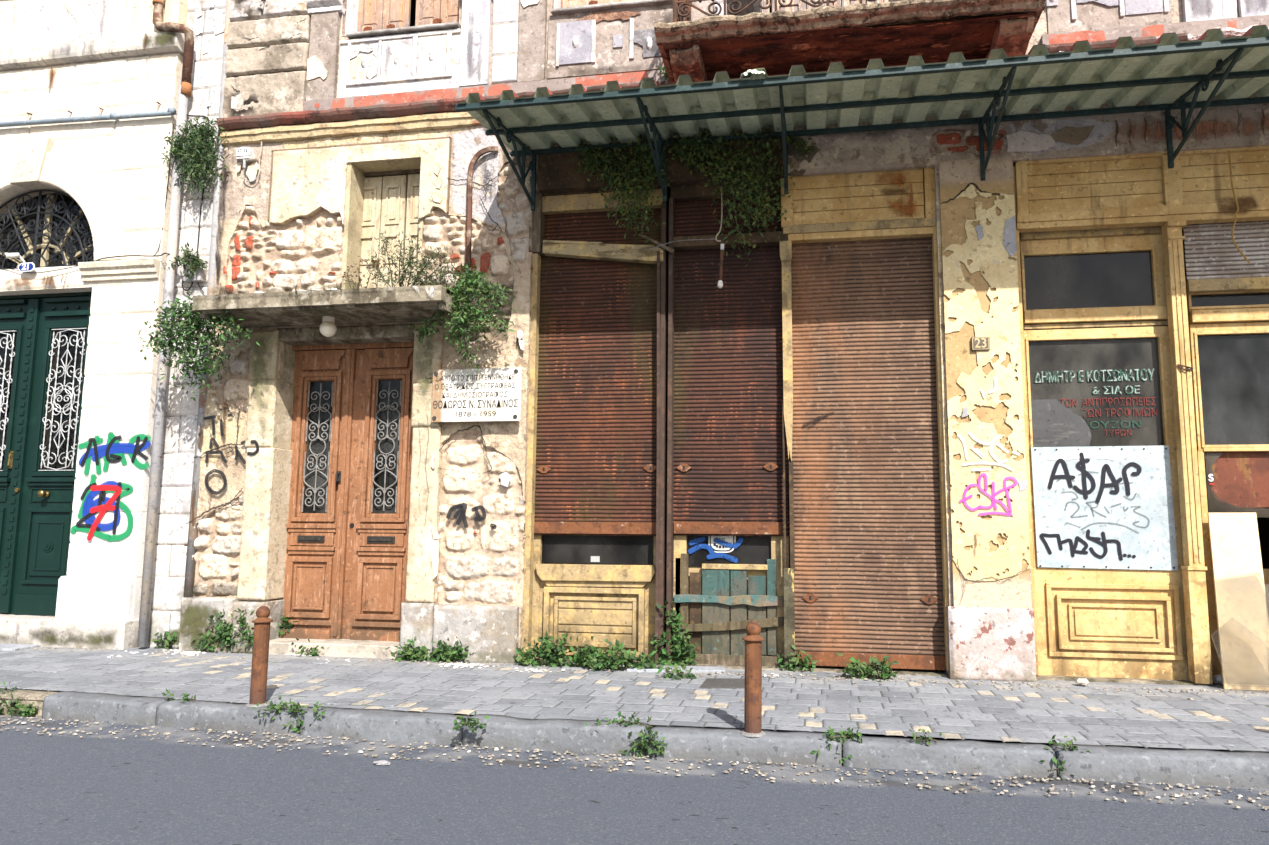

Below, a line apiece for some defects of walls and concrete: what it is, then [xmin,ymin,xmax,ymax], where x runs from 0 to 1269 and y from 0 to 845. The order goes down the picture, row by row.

rust [879,174,915,217]
spalling [223,206,344,294]
peeling [942,184,1031,581]